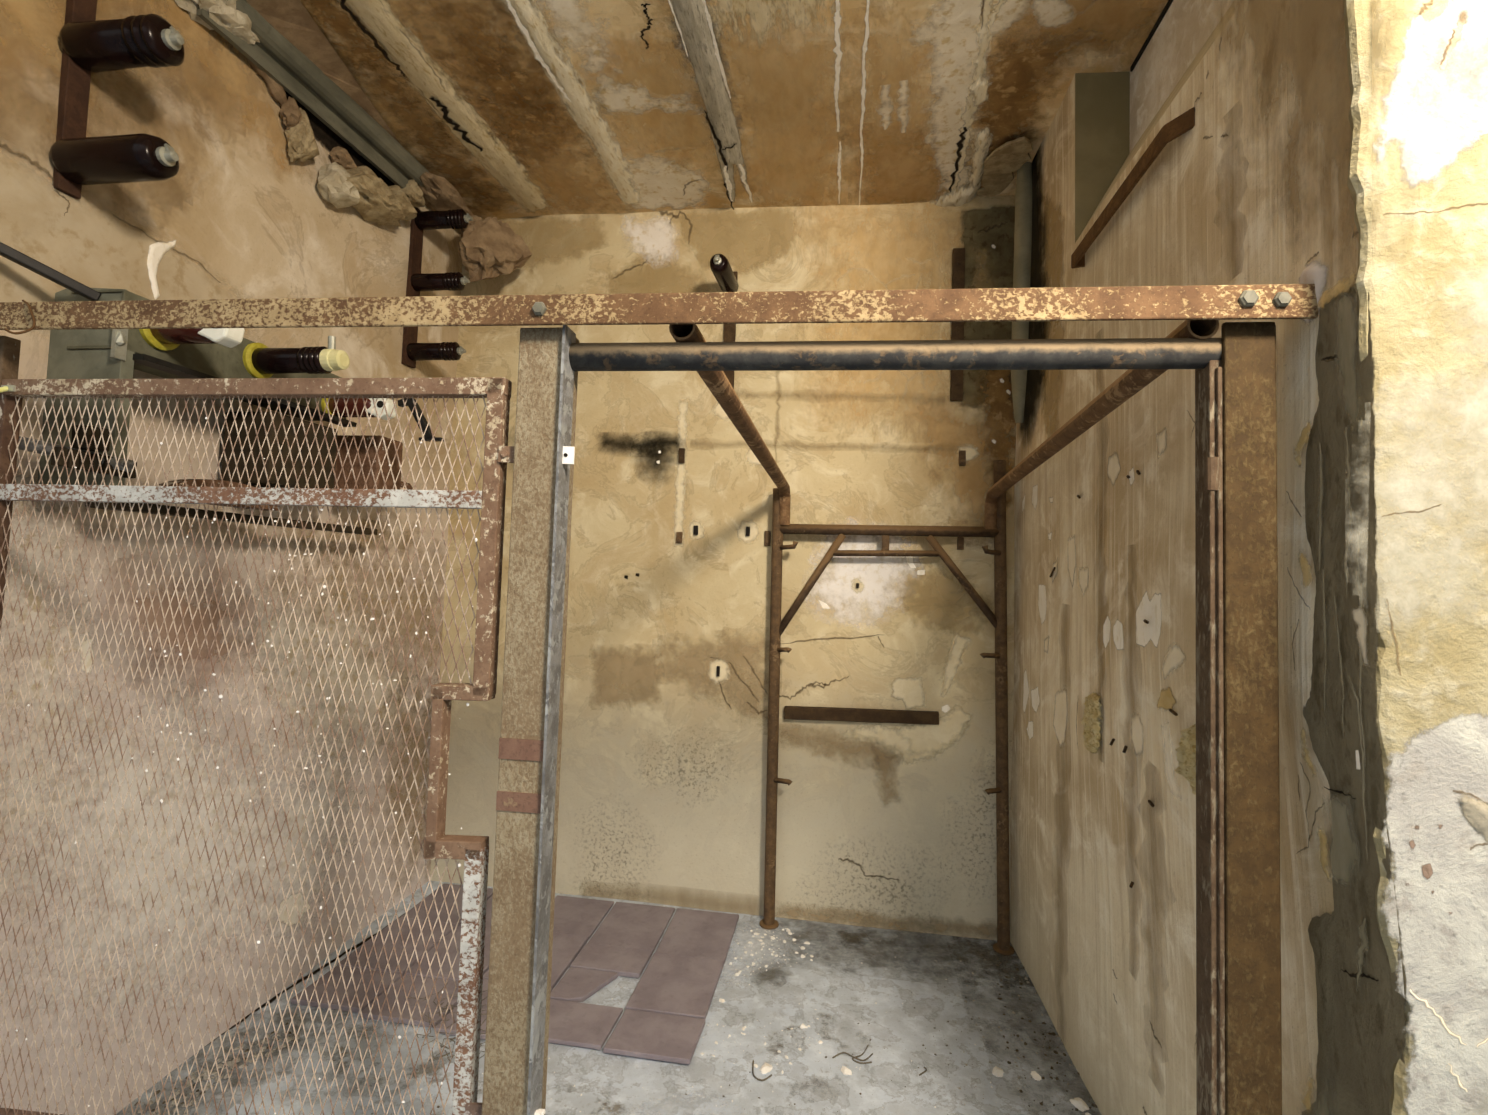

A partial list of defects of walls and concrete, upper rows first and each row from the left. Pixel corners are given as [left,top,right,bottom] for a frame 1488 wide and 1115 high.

crack [640,3,653,49]
peeling [1373,0,1488,186]
crack [1352,203,1488,238]
peeling [1318,273,1355,308]
peeling [1038,585,1047,624]
crack [783,634,884,647]
peeling [1353,608,1367,663]
water stain [594,642,768,719]
crack [779,676,849,700]
spalling [1023,670,1103,753]
spalling [1103,591,1196,796]
peeling [1381,714,1488,1115]